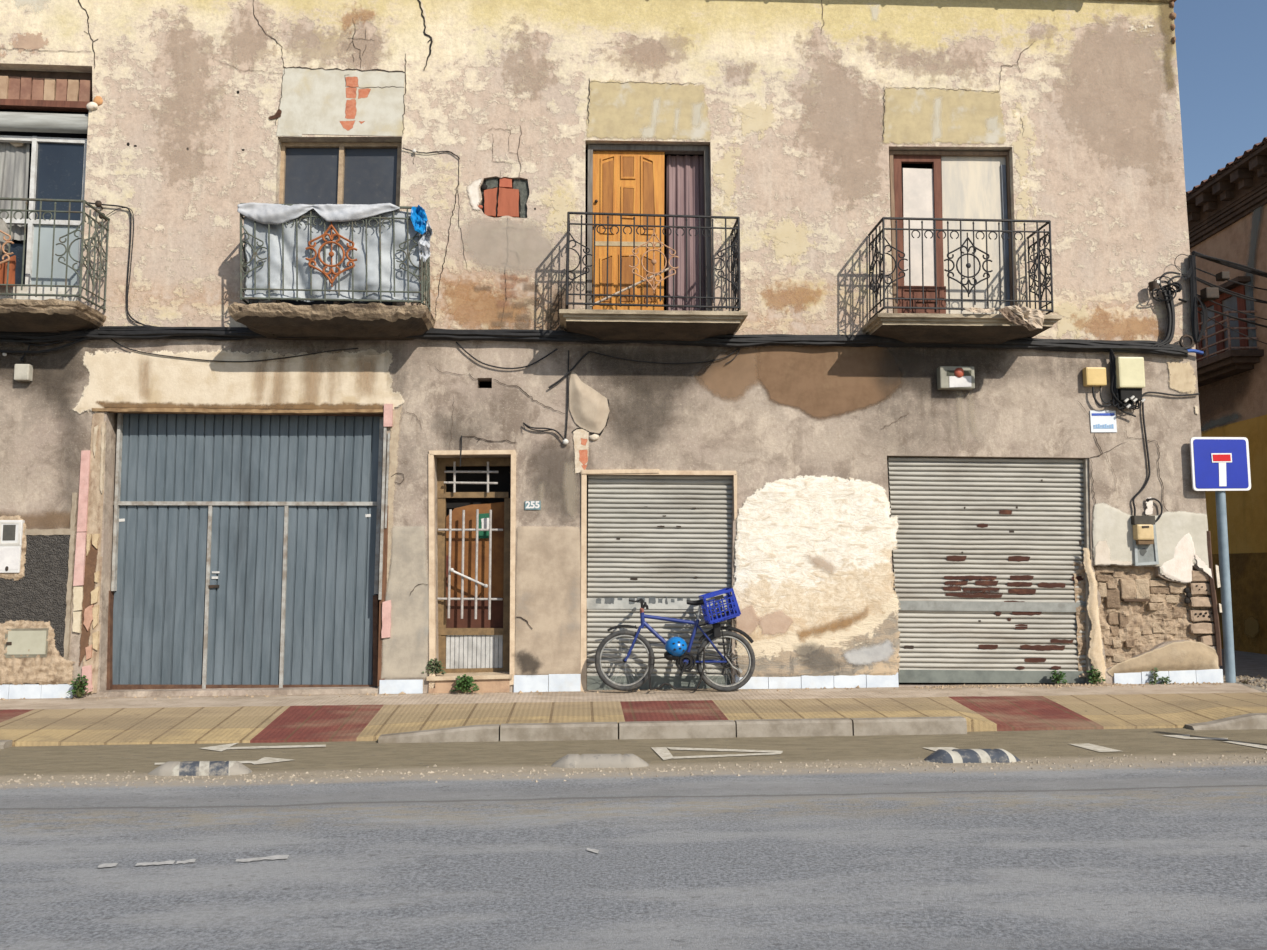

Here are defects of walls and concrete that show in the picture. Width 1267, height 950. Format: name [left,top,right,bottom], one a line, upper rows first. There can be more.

crack [0,0,98,68]
flaking render [340,77,371,131]
crack [883,41,1035,134]
crack [212,0,467,318]
crack [492,126,522,181]
flaking render [467,177,578,235]
rust [943,556,1083,629]
flaking render [1072,540,1216,683]
rust [1016,639,1074,670]